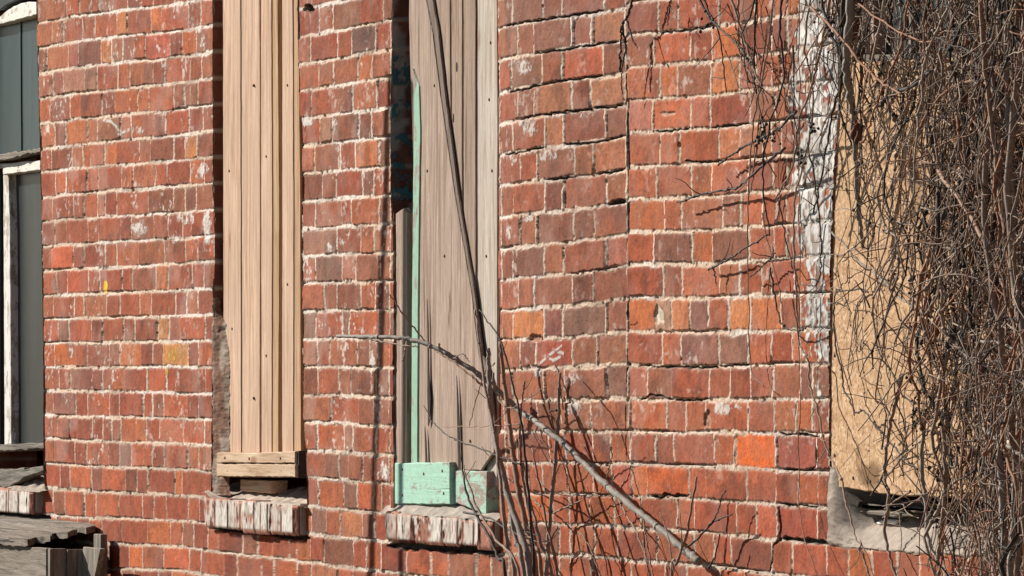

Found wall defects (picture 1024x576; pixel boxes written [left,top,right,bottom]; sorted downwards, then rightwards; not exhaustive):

crack [624,66,632,234]
peeling [787,0,839,364]
crack [626,394,707,442]